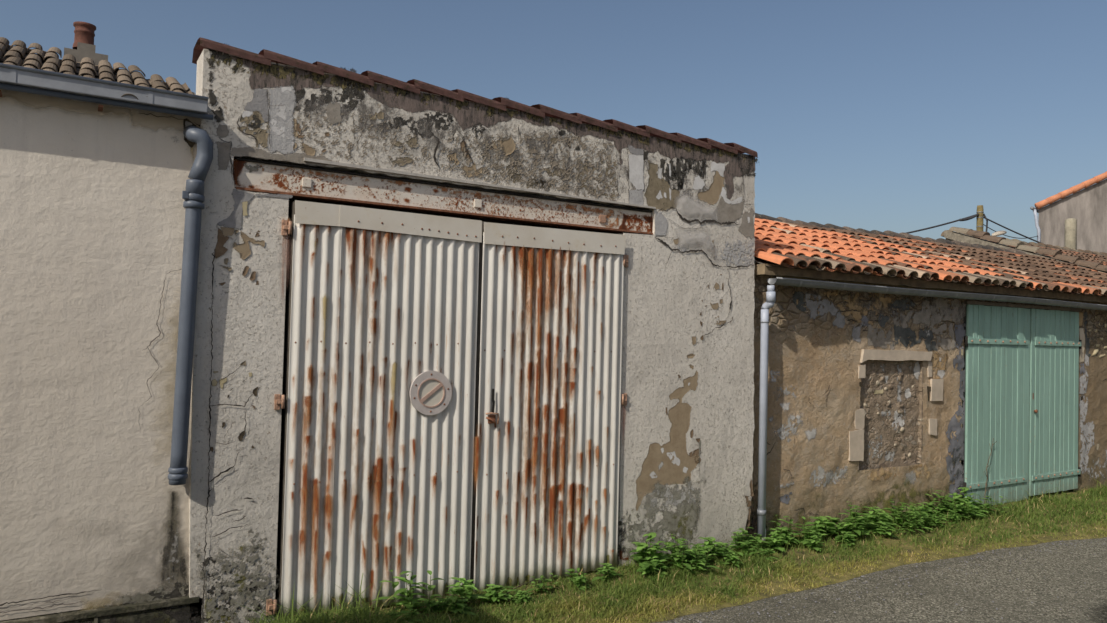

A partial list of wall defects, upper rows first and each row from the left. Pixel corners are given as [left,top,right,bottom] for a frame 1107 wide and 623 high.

leakage [75,491,189,612]
crack [139,269,181,429]
crack [202,250,254,617]
peeling [214,227,265,285]
rust [341,227,400,335]
rust [344,355,421,593]
rust [233,160,653,233]
peeling [216,102,680,211]
rust [496,245,609,569]
peeling [636,274,726,511]
crack [656,180,753,335]
peeling [693,162,755,239]